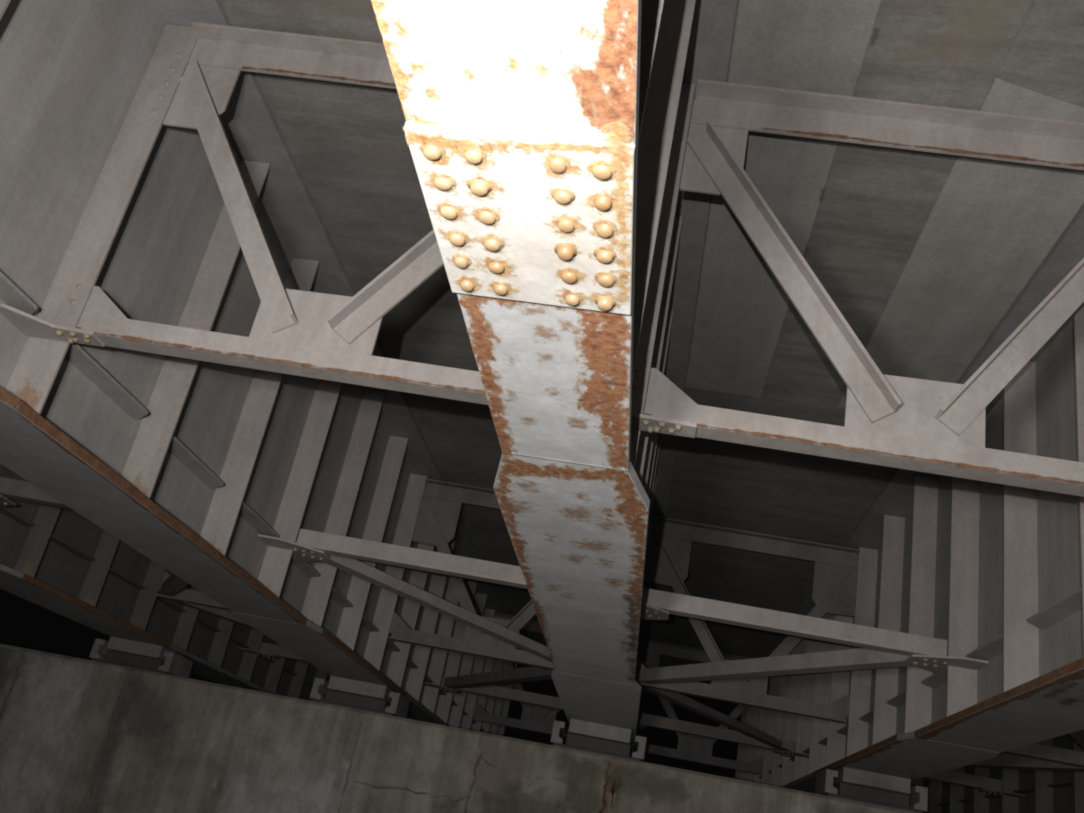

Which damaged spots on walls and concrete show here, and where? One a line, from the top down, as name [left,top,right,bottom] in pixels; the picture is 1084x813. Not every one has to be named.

corrosion [94,0,648,681]
corrosion [914,657,1084,739]
corrosion [813,734,902,777]